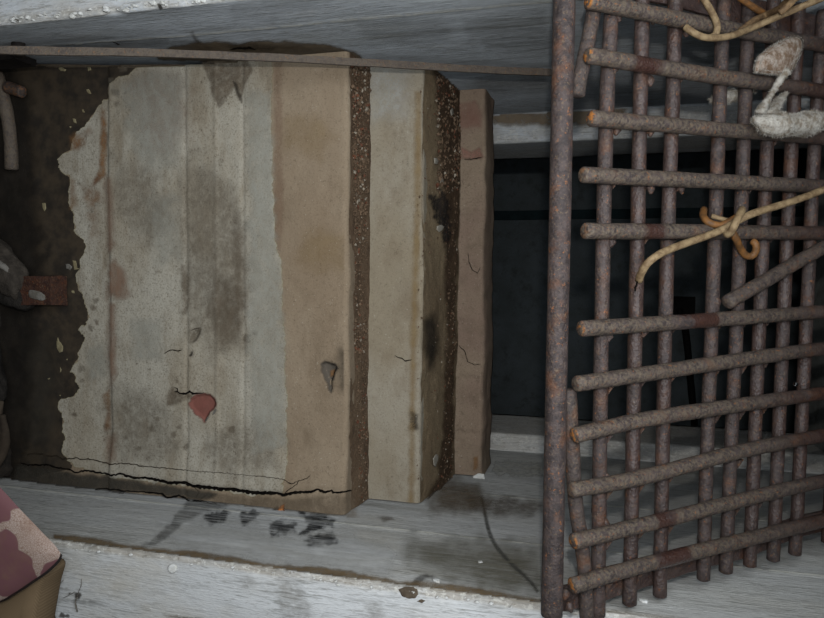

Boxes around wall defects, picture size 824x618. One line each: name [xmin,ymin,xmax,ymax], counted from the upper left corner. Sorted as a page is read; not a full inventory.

spalling [321,361,338,392]
spalling [168,388,217,422]
crack [20,452,352,504]